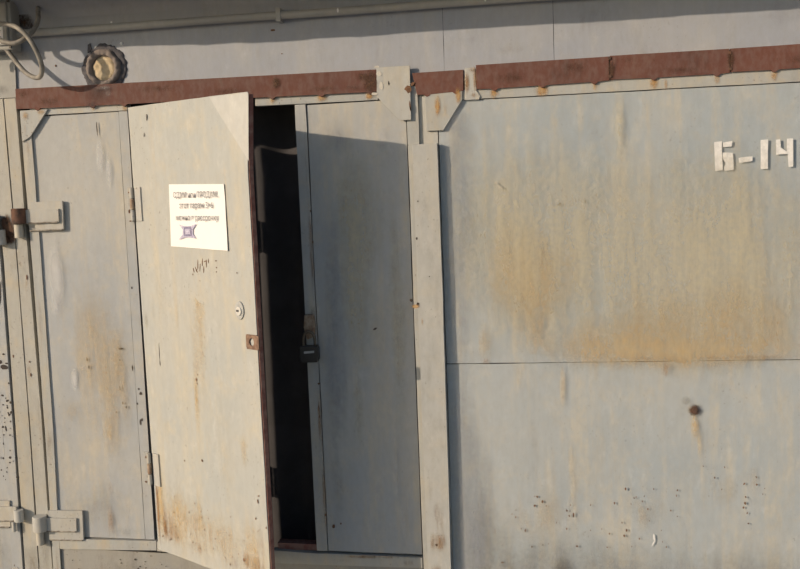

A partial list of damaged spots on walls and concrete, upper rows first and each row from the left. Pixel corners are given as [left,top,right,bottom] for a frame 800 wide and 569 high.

corrosion [359,73,375,98]